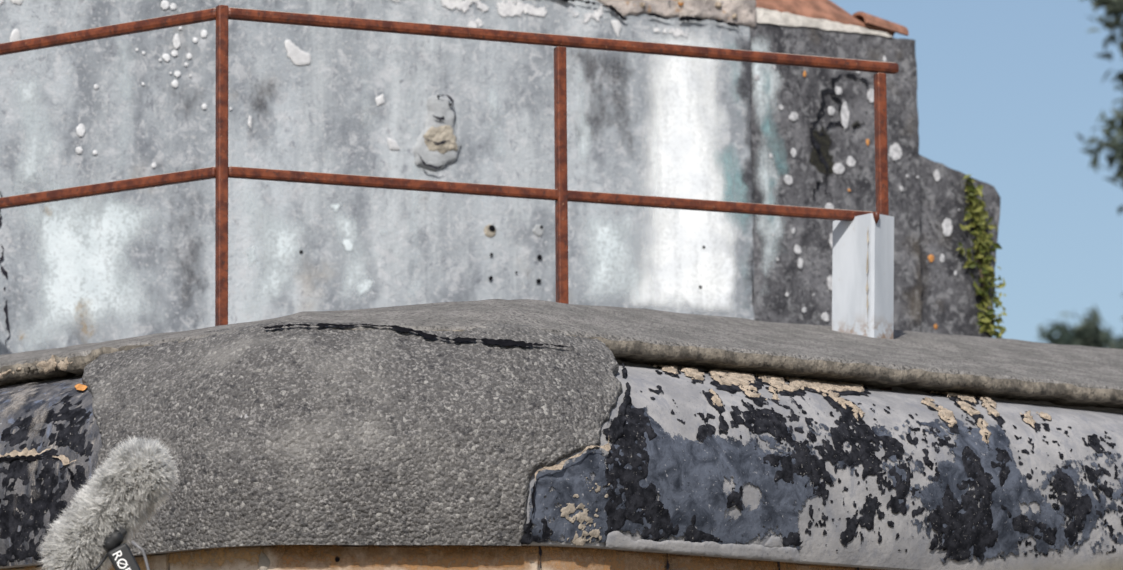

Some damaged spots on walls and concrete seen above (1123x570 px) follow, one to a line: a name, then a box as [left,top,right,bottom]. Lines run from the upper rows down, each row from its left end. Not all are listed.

crack [0,191,11,343]
crack [263,323,574,347]
peeling [0,390,93,567]
peeling [520,363,1123,563]